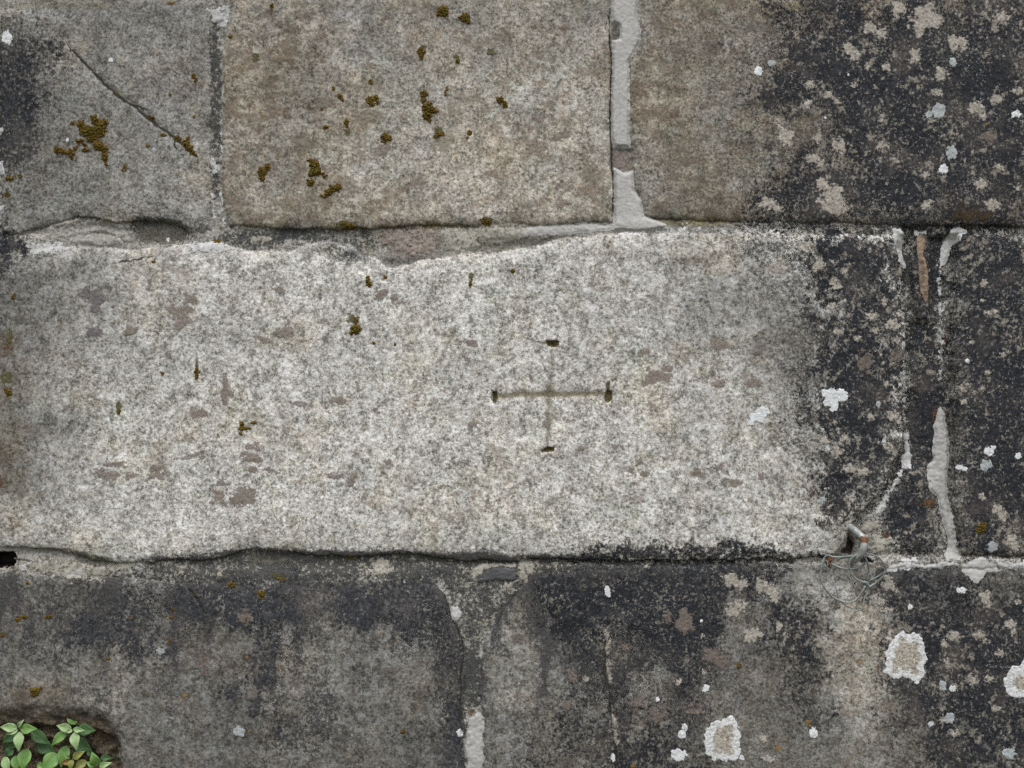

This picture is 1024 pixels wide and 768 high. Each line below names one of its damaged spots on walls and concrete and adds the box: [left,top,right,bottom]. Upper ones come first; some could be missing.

crack [67,44,194,155]
water stain [737,0,1024,768]
water stain [29,565,468,768]
water stain [519,536,845,768]